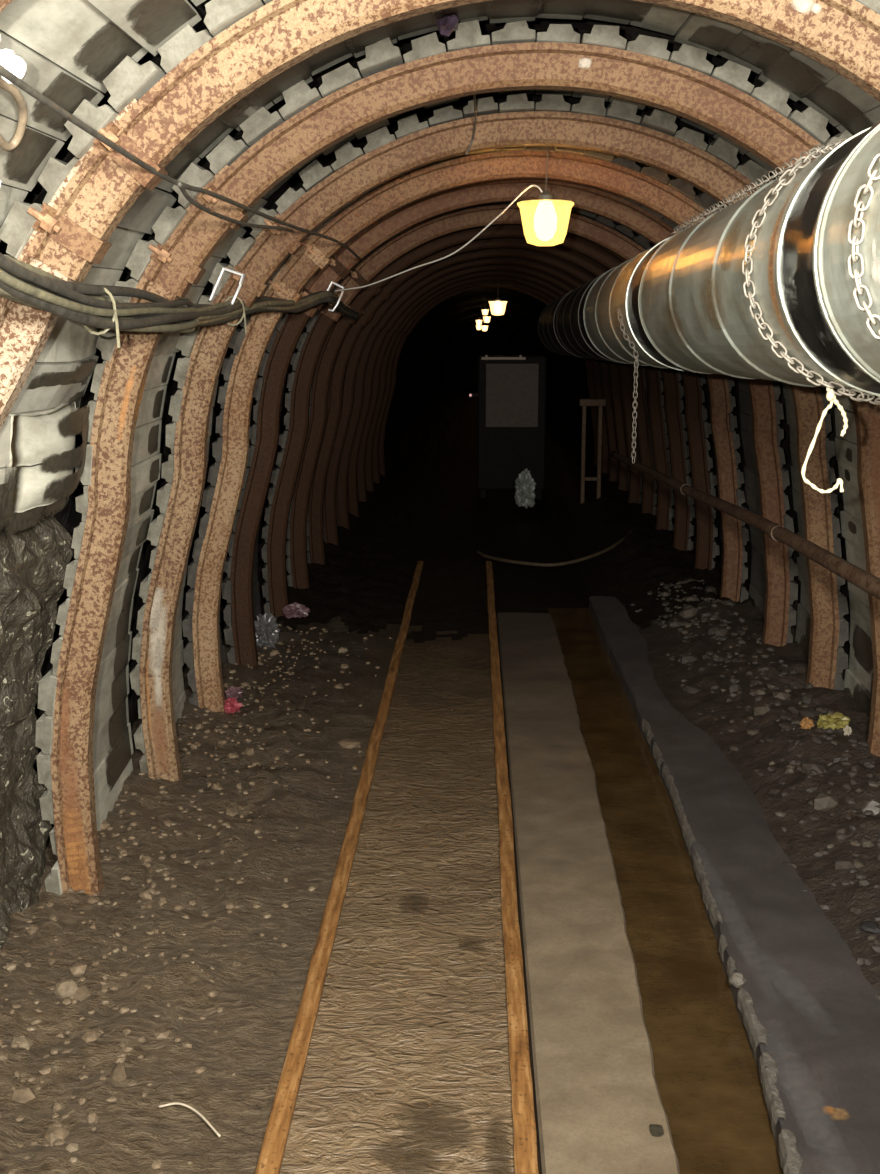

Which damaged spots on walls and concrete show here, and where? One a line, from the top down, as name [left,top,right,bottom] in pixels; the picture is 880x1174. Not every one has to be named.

corrosion [120,379,145,427]